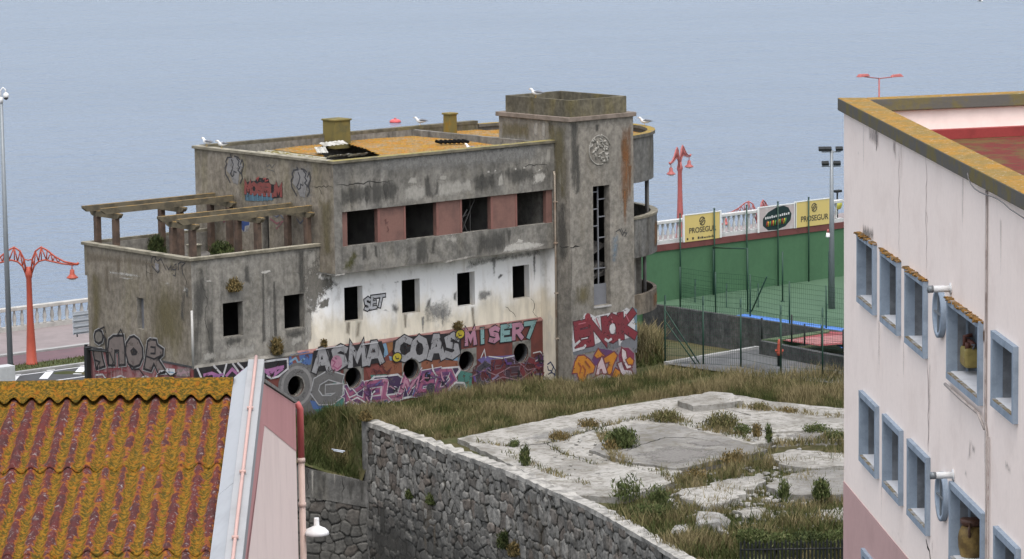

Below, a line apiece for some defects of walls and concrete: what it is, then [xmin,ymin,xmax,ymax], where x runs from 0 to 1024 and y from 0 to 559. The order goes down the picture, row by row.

crack [312,180,393,194]
water stain [342,182,396,202]
water stain [382,122,550,195]
rust [622,130,631,215]
flaking render [305,250,345,346]
water stain [422,293,456,327]